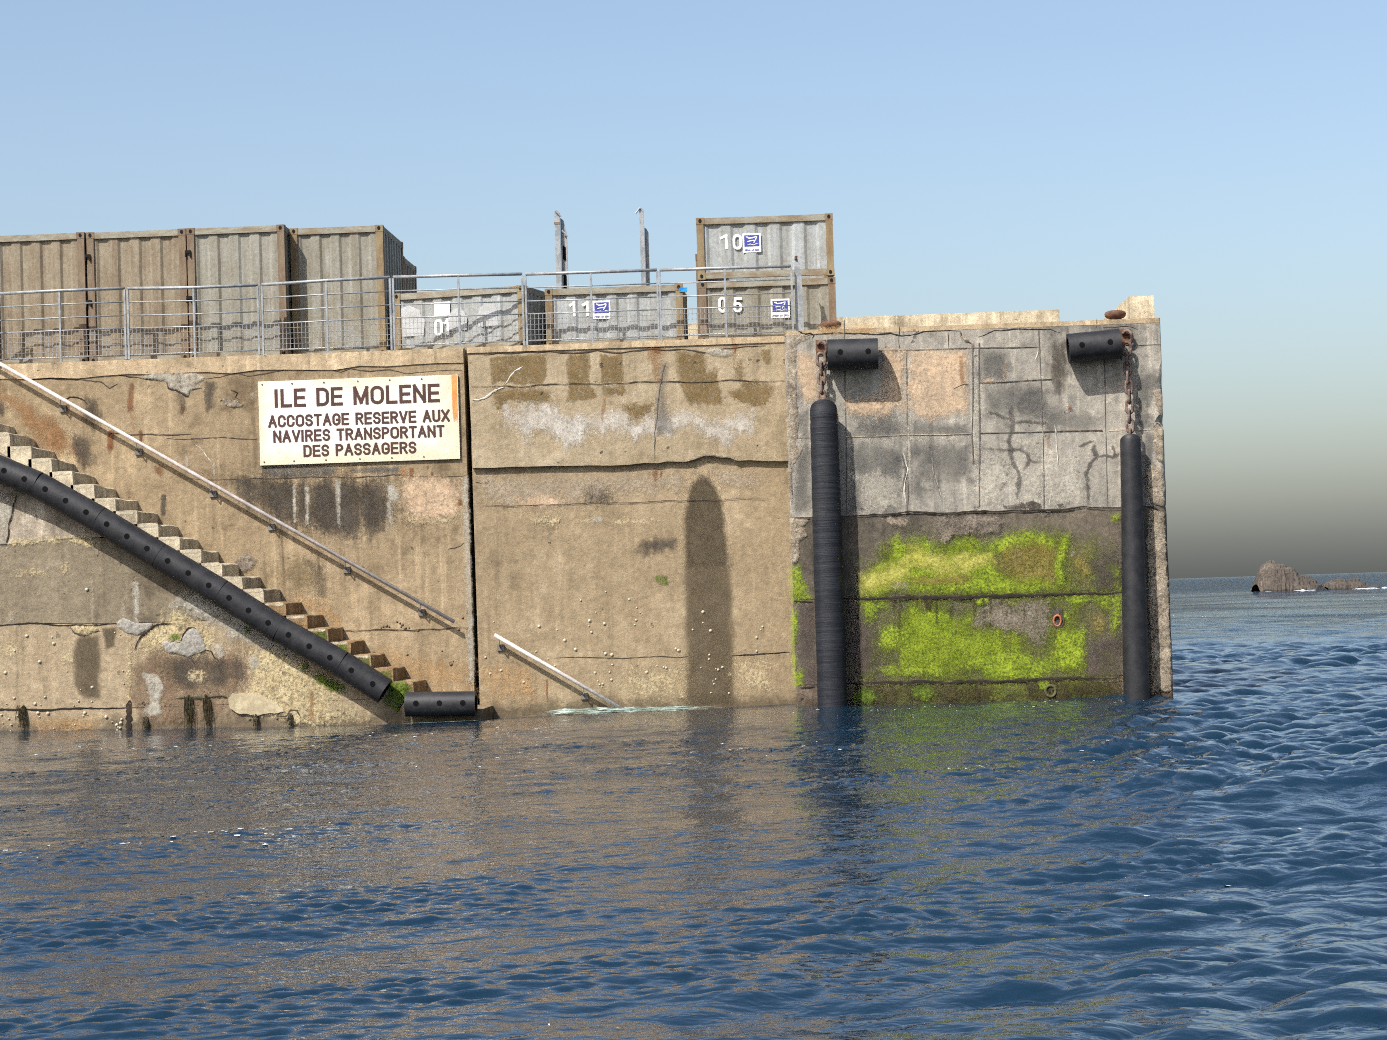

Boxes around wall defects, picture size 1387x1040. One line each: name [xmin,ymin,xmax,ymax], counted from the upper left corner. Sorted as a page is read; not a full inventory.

leakage [490,350,774,460]
leakage [235,466,398,539]
crack [851,412,1161,516]
spalling [70,625,98,636]
leakage [75,582,139,697]
peeling [117,593,338,725]